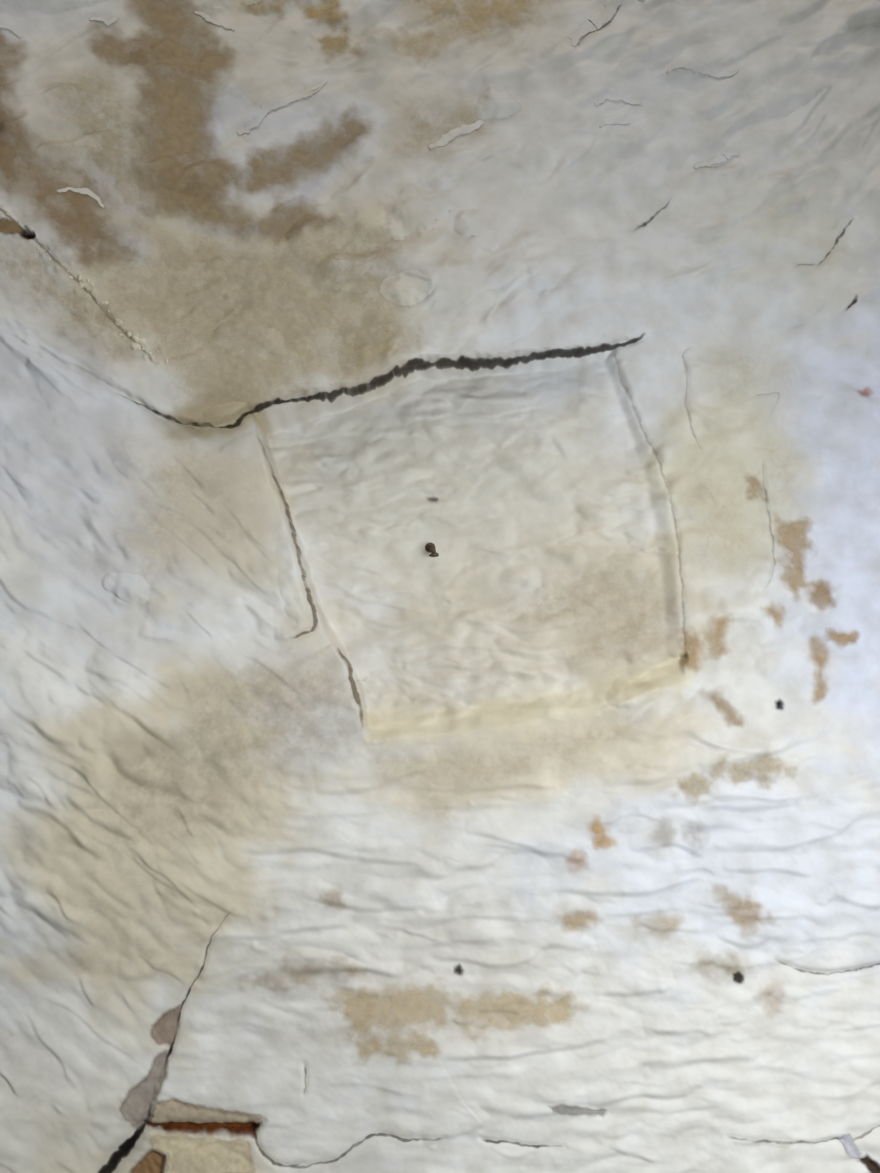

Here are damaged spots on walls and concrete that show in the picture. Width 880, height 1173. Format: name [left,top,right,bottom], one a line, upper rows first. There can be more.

leakage [0,35,128,271]
leakage [93,0,366,238]
leakage [121,236,393,398]
crack [220,337,641,428]
crack [166,953,207,1061]
crack [99,1096,418,1173]